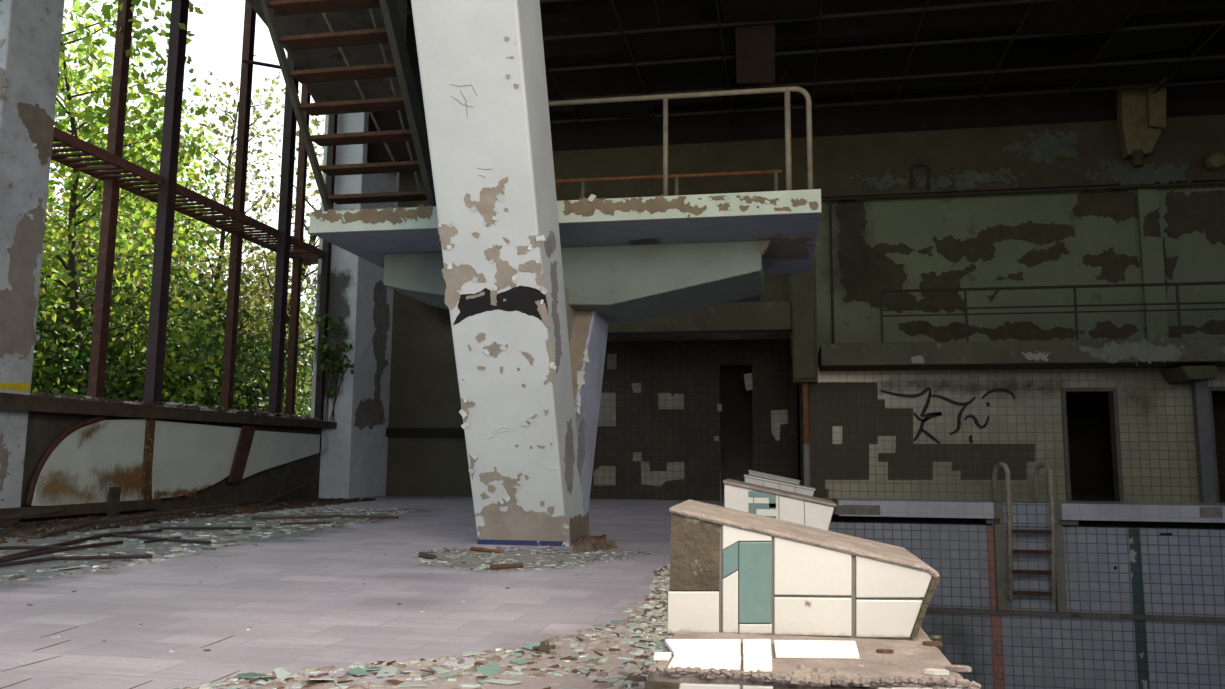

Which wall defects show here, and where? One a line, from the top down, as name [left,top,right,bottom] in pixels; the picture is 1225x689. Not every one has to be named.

peeling [16,102,55,166]
peeling [0,197,47,374]
peeling [563,194,818,217]
peeling [757,233,818,260]
peeling [836,128,1225,365]
peeling [311,177,593,495]
corrosion [43,467,210,502]
peeling [468,453,589,546]
peeling [809,382,1035,515]